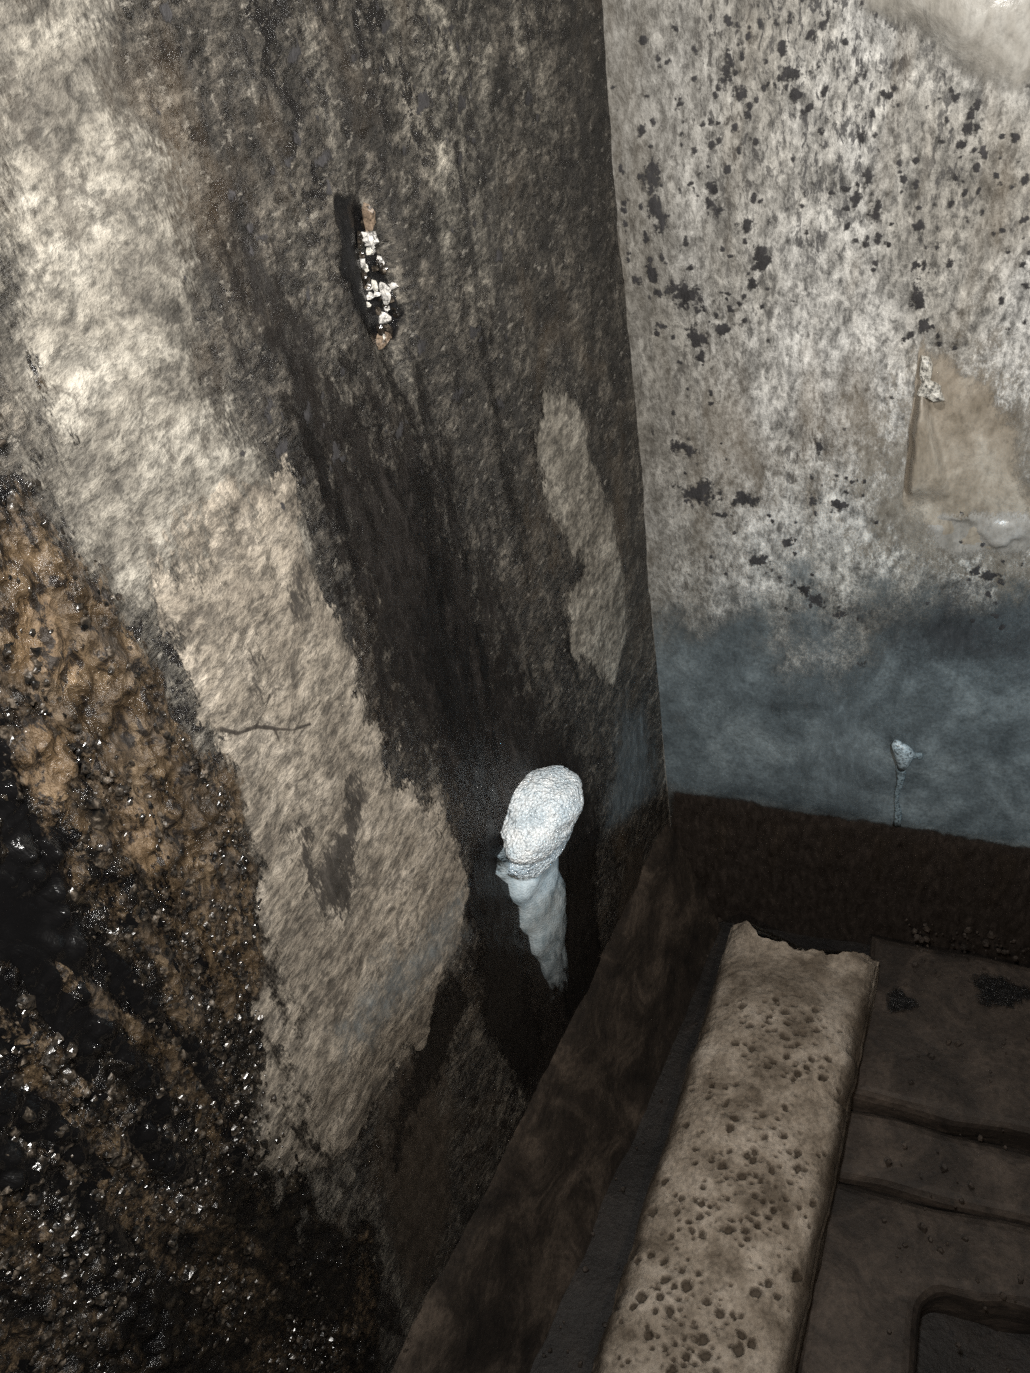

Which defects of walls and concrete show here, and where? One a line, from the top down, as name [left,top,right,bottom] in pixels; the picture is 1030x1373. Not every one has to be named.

water stain [414,67,472,115]
water stain [853,71,900,152]
water stain [619,0,838,369]
water stain [829,167,894,272]
water stain [896,86,1030,351]
water stain [670,438,774,535]
water stain [782,474,866,556]
peeling [0,0,470,1204]
crack [220,694,311,739]
water stain [654,511,1030,848]
water stain [264,304,603,1352]
water stain [250,911,307,1030]